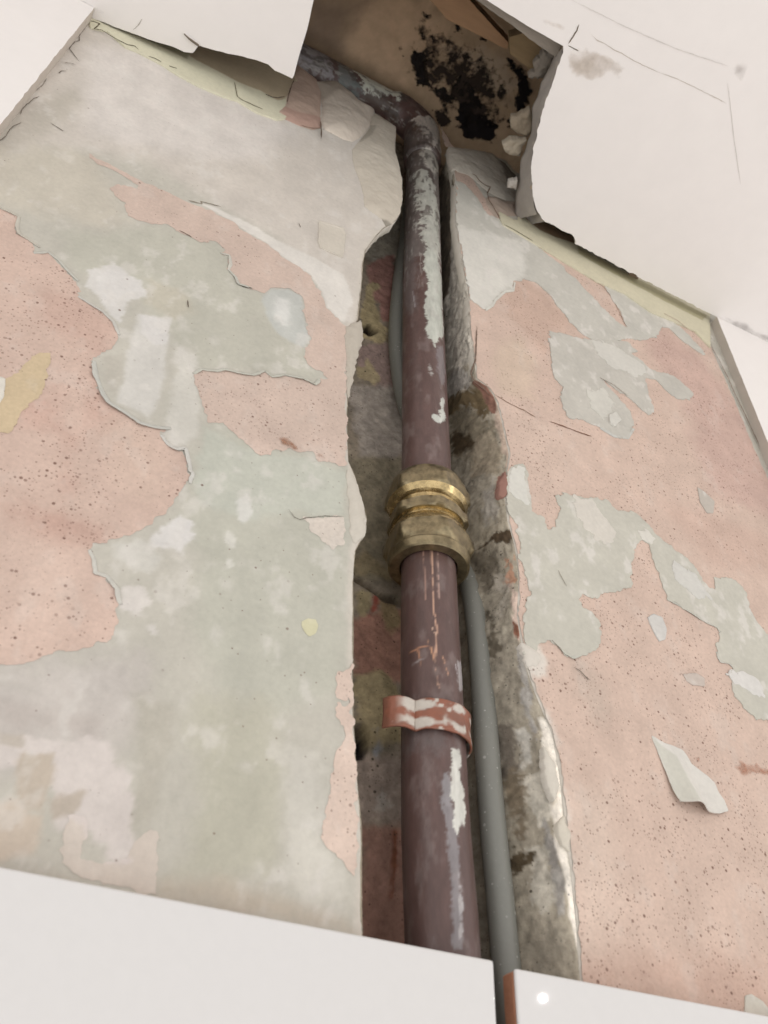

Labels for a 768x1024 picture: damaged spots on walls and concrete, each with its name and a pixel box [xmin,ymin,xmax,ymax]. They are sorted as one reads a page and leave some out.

flaking render [279,65,321,130]
mould [411,12,533,141]
crack [568,0,741,184]
peeling [0,207,195,665]
peeling [89,154,366,550]
peeling [458,234,768,1012]
peeling [321,663,360,876]